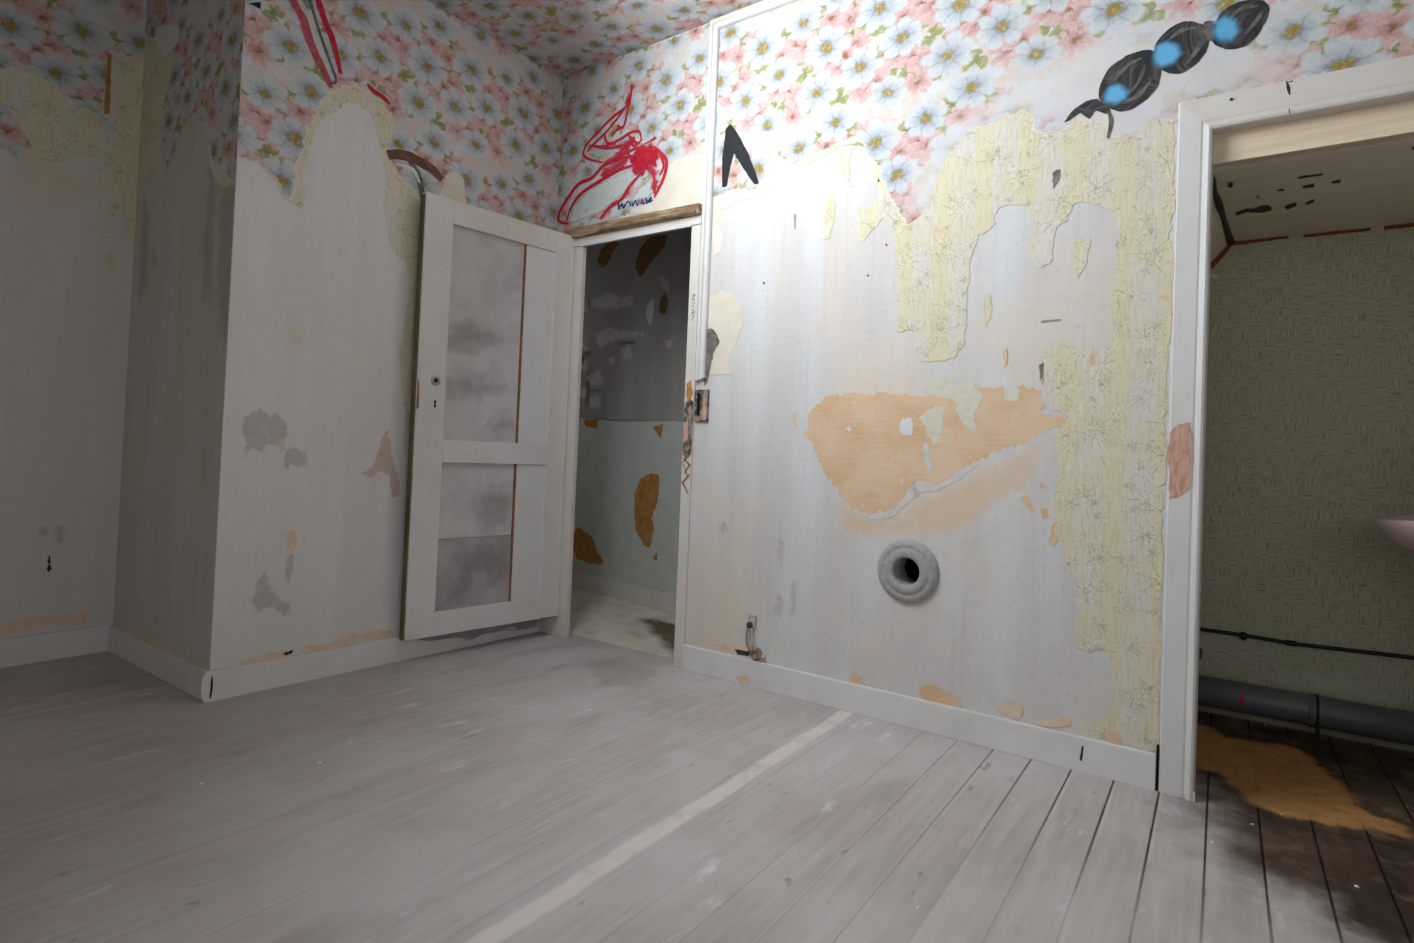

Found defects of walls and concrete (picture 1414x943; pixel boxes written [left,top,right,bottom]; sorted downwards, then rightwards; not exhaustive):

flaking render [1052,169,1060,189]
flaking render [792,363,1065,552]
peeling [1167,422,1193,499]
flaking render [712,643,751,656]
flaking render [919,684,961,707]
flaking render [996,701,1071,727]
damp [1197,710,1414,811]
damp [1053,766,1414,943]